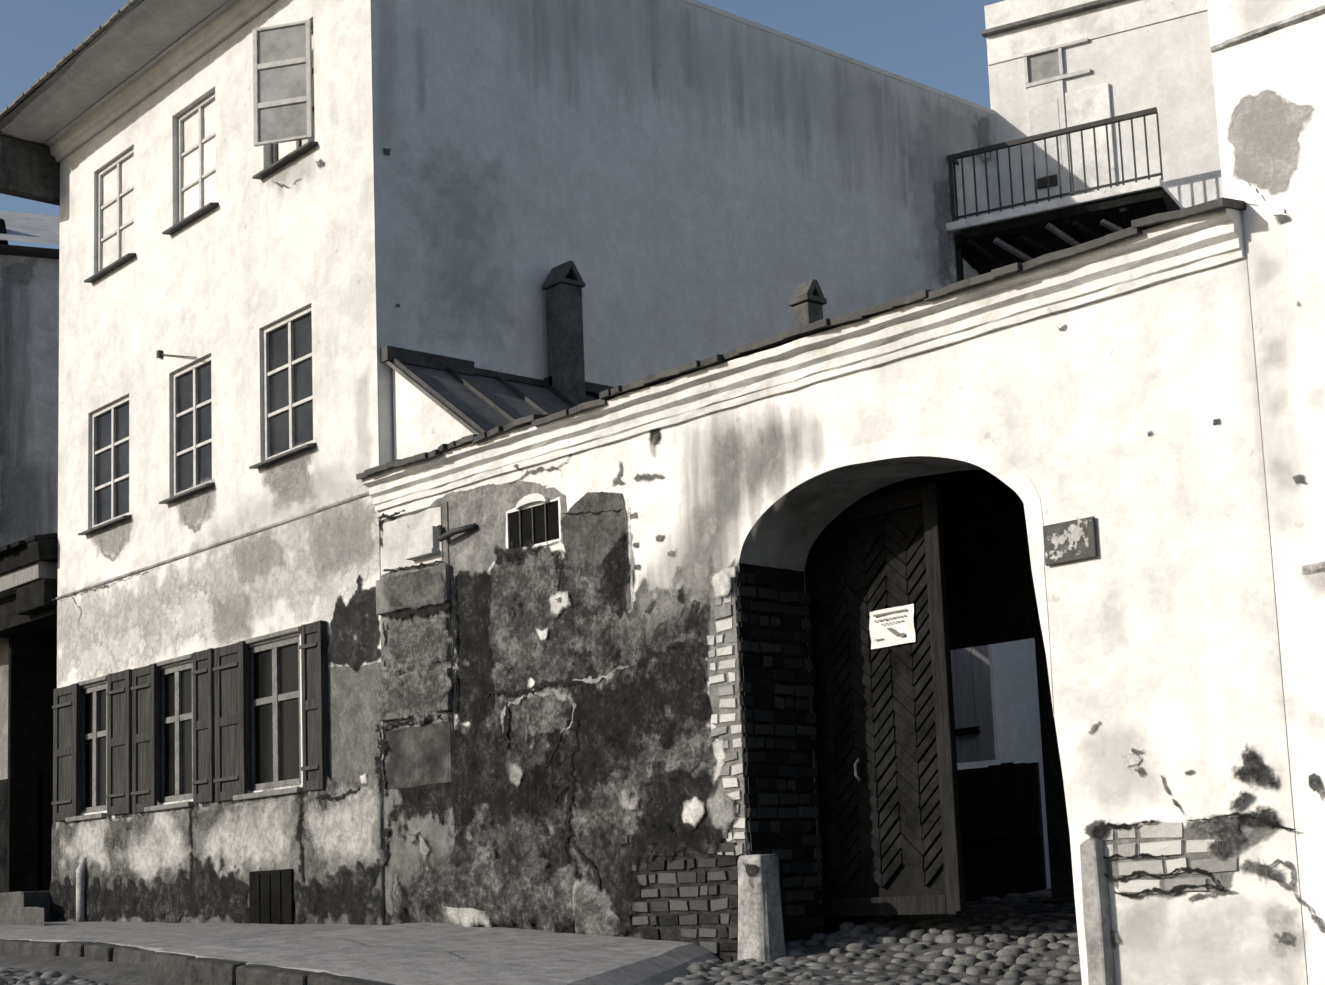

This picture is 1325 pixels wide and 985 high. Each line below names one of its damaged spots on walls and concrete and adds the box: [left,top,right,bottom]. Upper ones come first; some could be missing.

peeling [1228,90,1312,224]
damp [0,263,41,547]
damp [597,425,797,630]
damp [50,770,381,925]
peeling [315,535,826,962]
spalling [1085,746,1297,898]
crack [1188,858,1325,933]